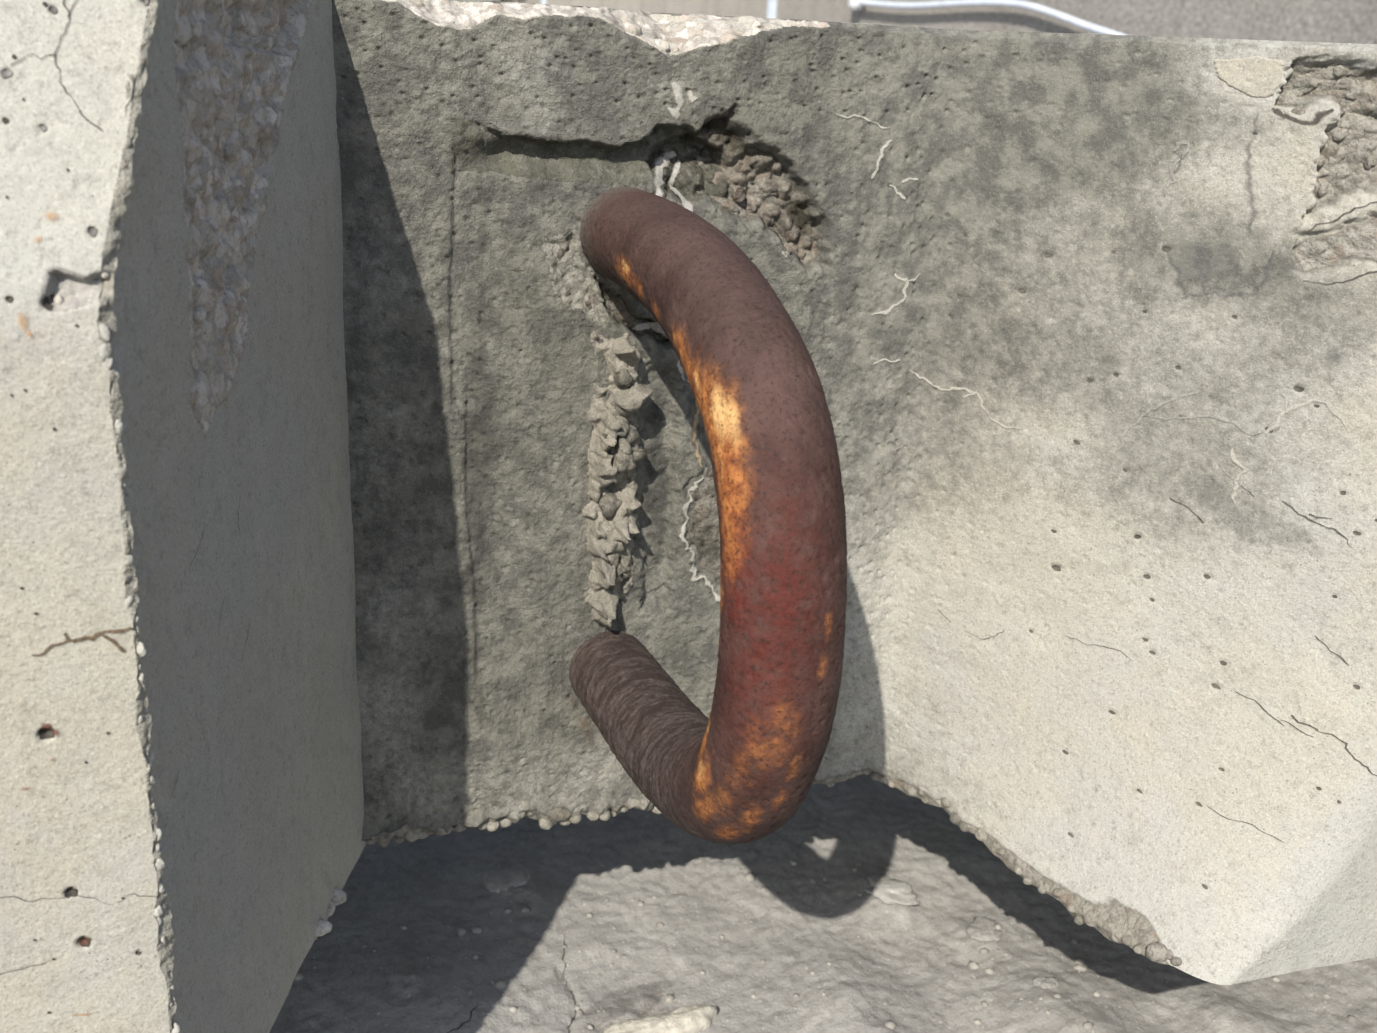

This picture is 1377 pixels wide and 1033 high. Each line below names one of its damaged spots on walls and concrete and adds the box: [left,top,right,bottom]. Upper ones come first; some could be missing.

spalling [382,0,830,58]
spalling [1271,64,1377,209]
spalling [449,116,818,265]
spalling [542,230,668,342]
spalling [1294,218,1377,271]
crack [32,627,133,656]
crack [1235,691,1377,776]
crack [0,893,157,905]
crack [559,934,586,1033]